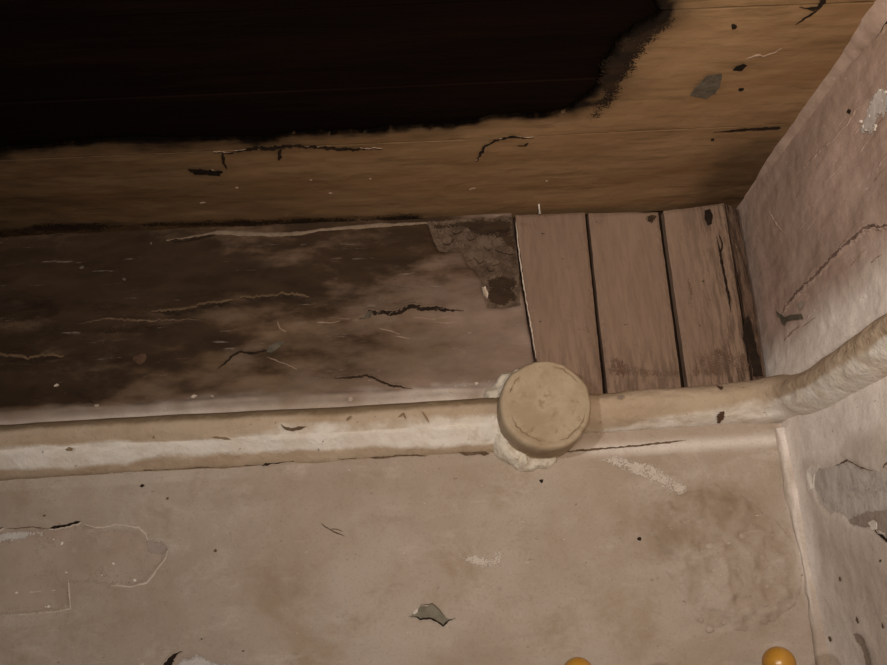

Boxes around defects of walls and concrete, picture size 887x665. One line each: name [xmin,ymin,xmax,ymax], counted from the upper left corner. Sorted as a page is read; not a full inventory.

crack [796,0,826,25]
crack [476,136,534,162]
flaking render [166,215,520,308]
crack [781,224,887,315]
crack [76,291,309,370]
crack [317,301,464,339]
flaking render [806,459,887,543]
flaking render [408,601,456,629]
peeling [177,654,234,665]